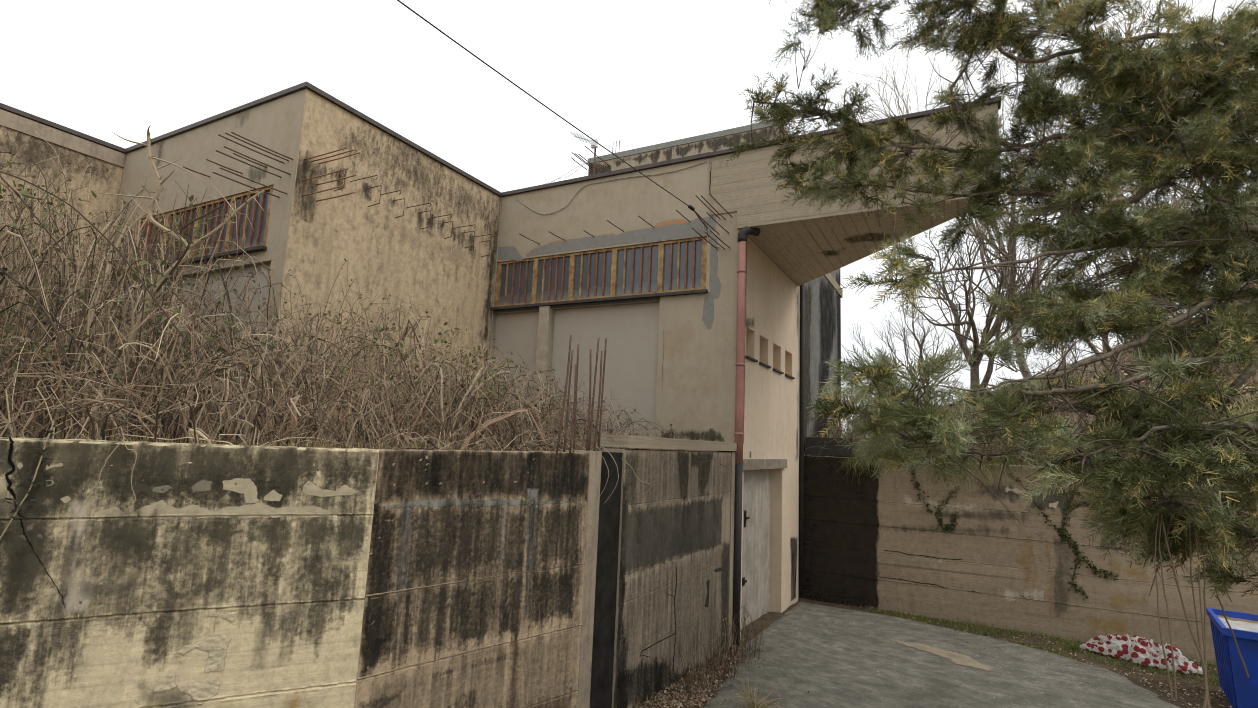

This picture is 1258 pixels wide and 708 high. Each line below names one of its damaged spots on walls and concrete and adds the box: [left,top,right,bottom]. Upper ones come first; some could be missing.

leakage [295,153,321,216]
leakage [350,137,498,339]
peeling [46,463,71,506]
peeling [94,478,359,519]
leakage [613,429,729,708]